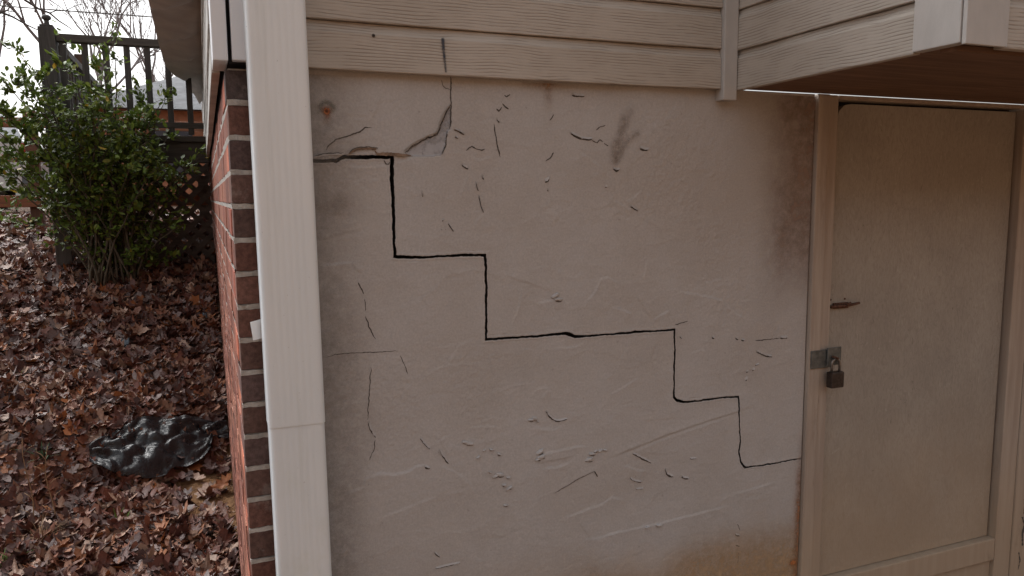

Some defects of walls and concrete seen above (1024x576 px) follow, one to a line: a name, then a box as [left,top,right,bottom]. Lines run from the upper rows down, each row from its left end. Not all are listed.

spalling [315,77,464,165]
crack [313,127,800,471]